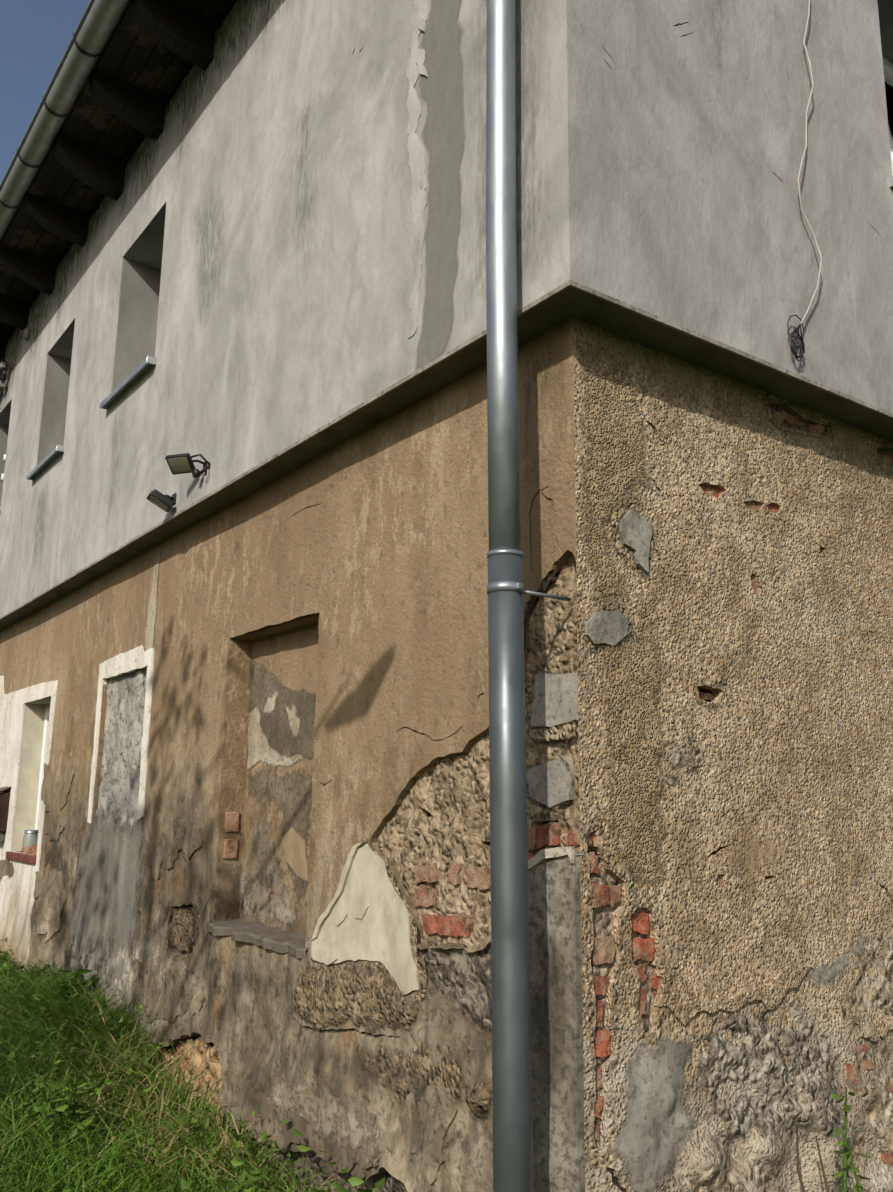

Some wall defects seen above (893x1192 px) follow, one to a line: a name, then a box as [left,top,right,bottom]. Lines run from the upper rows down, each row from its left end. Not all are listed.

peeling [406,0,428,339]
peeling [0,859,14,882]
peeling [33,864,68,942]
water stain [44,845,67,874]
water stain [40,912,149,1012]
peeling [131,900,205,1024]
peeling [239,659,316,926]
flaking render [287,733,492,1035]
flaking render [525,554,679,1168]
peeling [217,1069,384,1173]
peeling [362,1039,462,1185]
flaking render [678,919,893,1192]